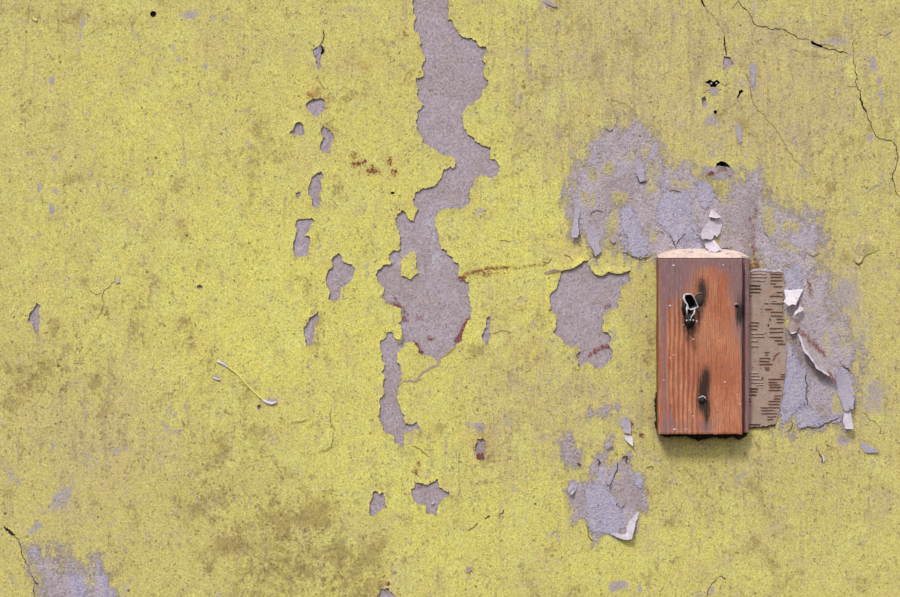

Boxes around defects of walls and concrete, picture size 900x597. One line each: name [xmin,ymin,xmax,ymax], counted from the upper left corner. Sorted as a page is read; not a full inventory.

peeling [306,98,334,154]
crack [704,1,899,196]
peeling [293,172,323,257]
peeling [376,0,500,447]
peeling [326,253,355,301]
corrosion [459,264,547,280]
peeling [544,110,878,453]
peeling [369,490,387,516]
peeling [411,479,449,515]
peeling [557,402,654,546]
crack [4,527,39,597]
peeling [22,537,120,597]